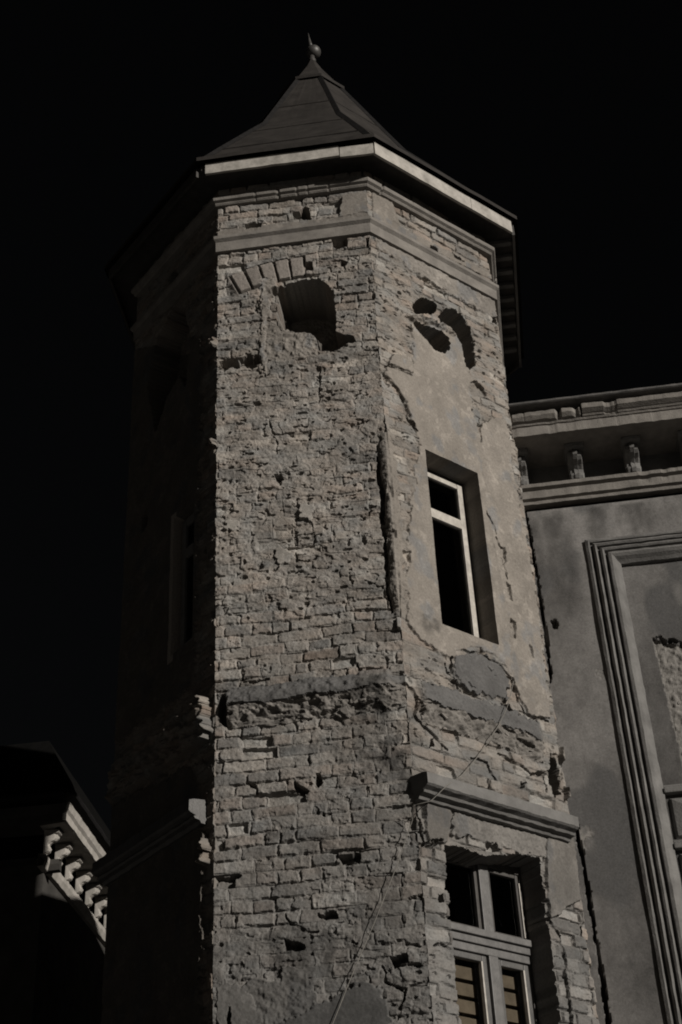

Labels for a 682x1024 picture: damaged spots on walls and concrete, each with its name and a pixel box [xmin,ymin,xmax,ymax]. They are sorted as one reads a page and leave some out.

crack [382,367,412,425]
crack [377,459,393,614]
spalling [226,684,400,732]
spalling [420,700,545,763]
spalling [654,642,682,758]